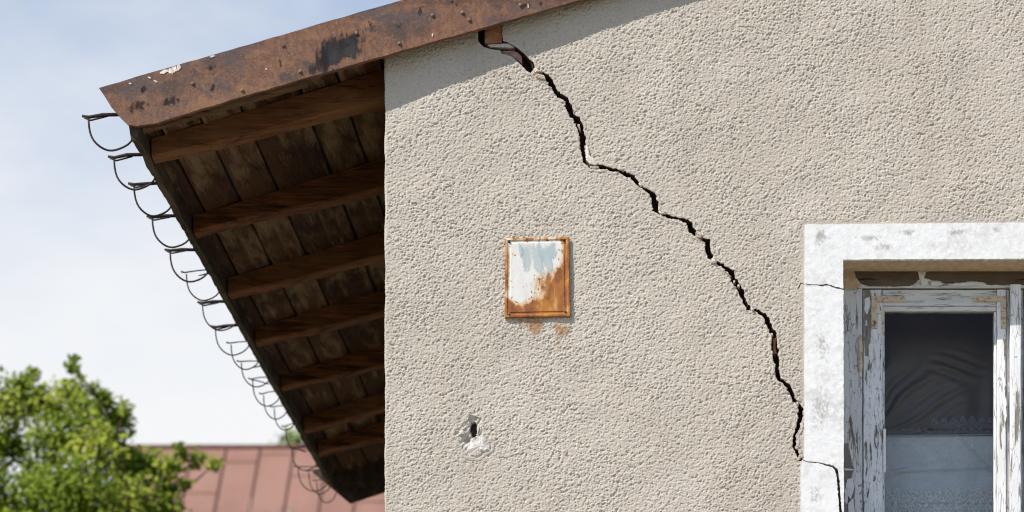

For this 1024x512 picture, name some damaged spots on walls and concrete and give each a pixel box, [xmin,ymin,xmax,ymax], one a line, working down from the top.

crack [475,24,844,512]
peeling [843,271,1024,370]
spalling [451,411,495,461]
peeling [844,443,855,512]